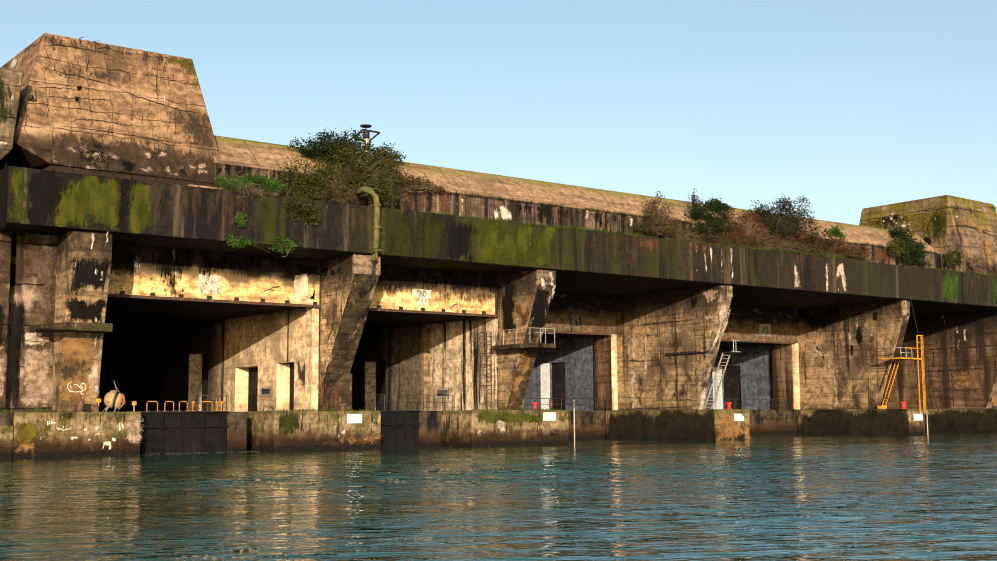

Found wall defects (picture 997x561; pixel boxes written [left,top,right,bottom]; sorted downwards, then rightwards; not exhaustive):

crack [35,35,202,145]
flaking render [68,141,208,176]
leakage [28,170,63,226]
leakage [91,179,129,249]
leakage [494,202,640,269]
leakage [677,243,736,278]
spalling [530,288,549,329]
flaking render [20,332,53,407]